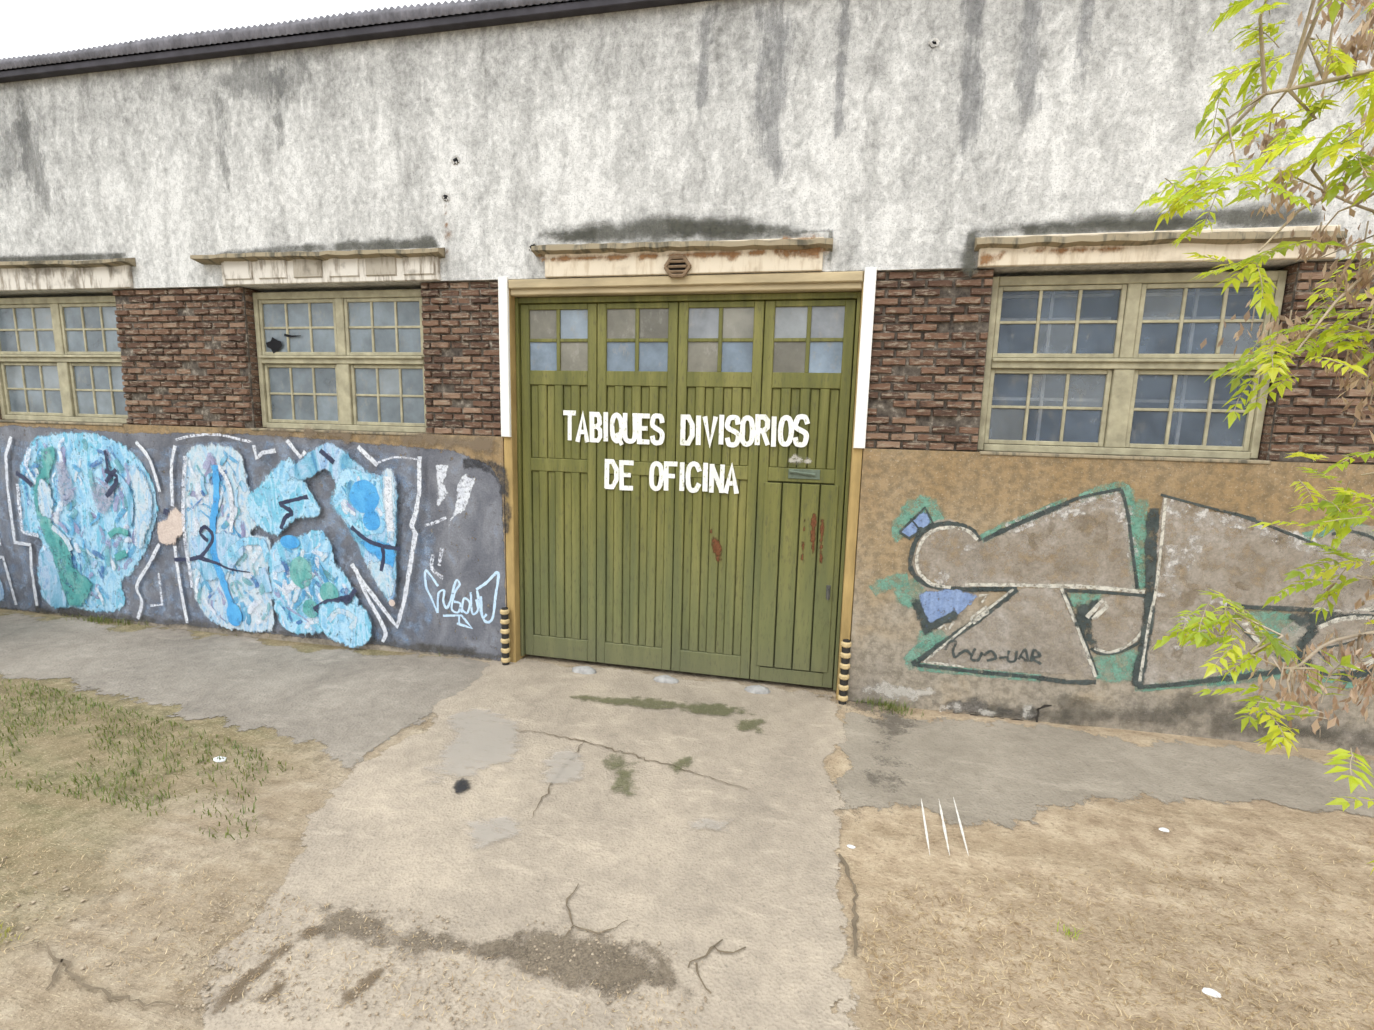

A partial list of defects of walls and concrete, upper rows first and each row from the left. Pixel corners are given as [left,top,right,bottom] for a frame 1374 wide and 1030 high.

crack [838,854,859,956]
crack [0,941,186,1007]